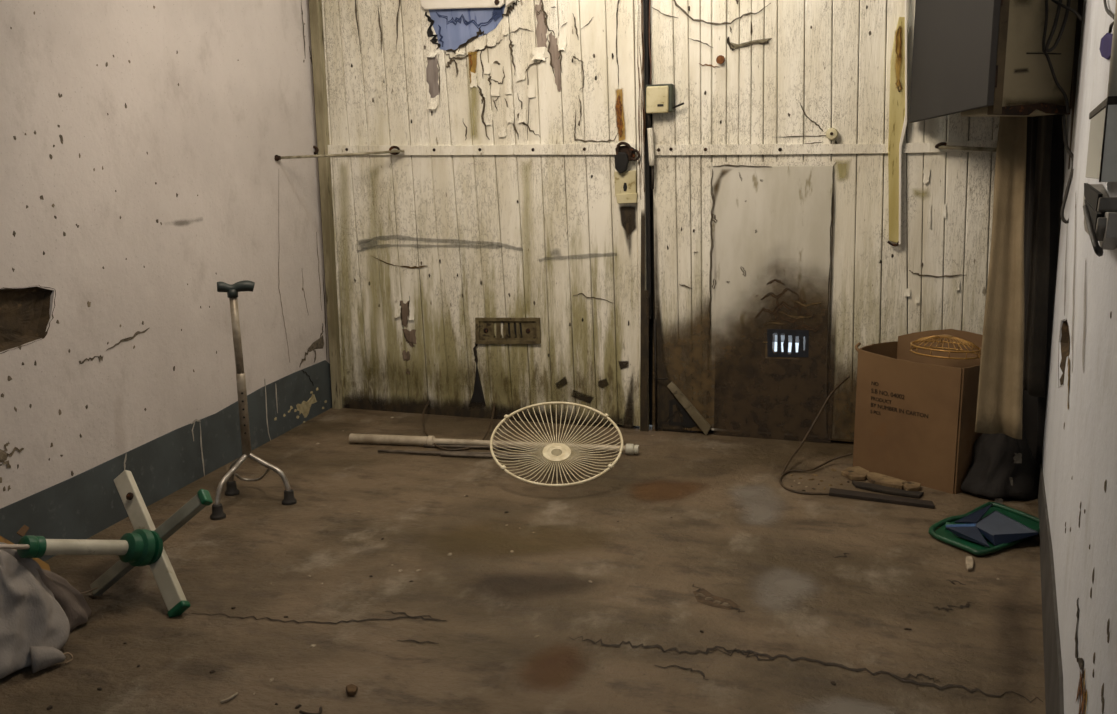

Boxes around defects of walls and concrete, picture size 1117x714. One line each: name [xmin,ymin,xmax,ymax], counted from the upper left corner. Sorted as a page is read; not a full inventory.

peeling [424,0,520,115]
peeling [532,0,573,92]
rust [615,0,645,200]
flaking render [0,285,59,366]
flaking render [300,323,324,365]
leakage [344,206,684,431]
peeling [274,387,327,423]
leakage [831,372,857,442]
crack [192,611,446,644]
crack [569,636,1043,703]